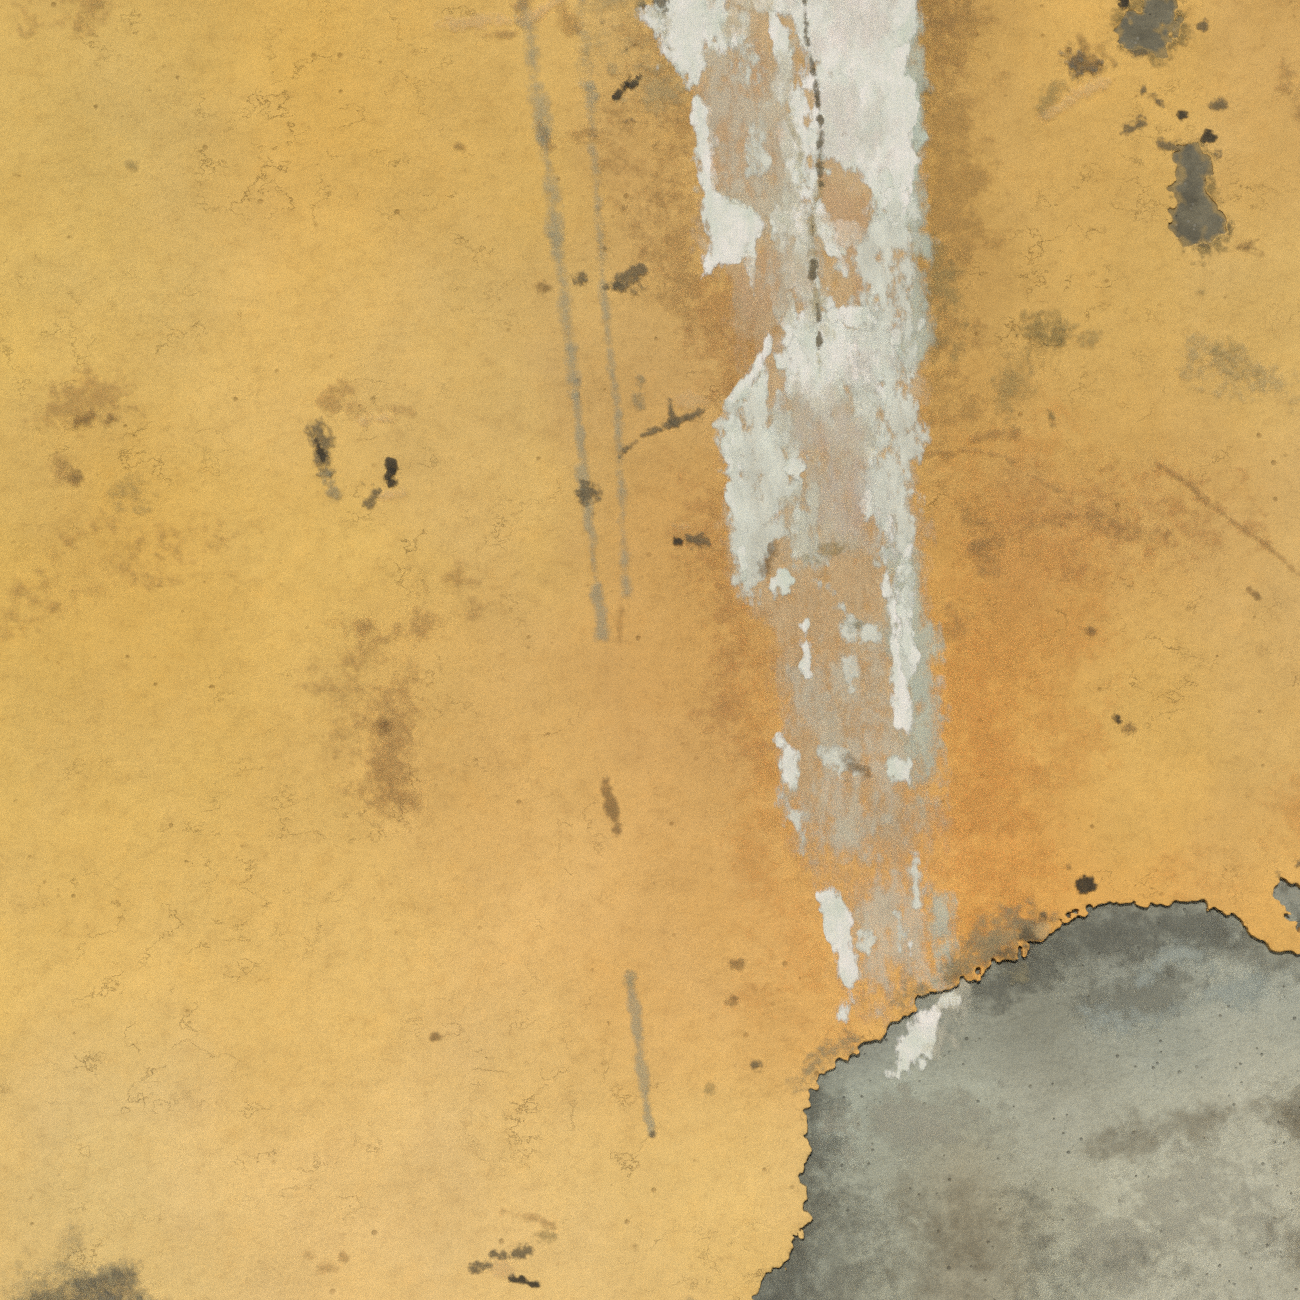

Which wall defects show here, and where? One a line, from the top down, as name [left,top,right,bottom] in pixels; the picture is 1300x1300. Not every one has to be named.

spalling [612,73,641,100]
water stain [576,480,600,505]
flaking render [636,0,1300,1300]